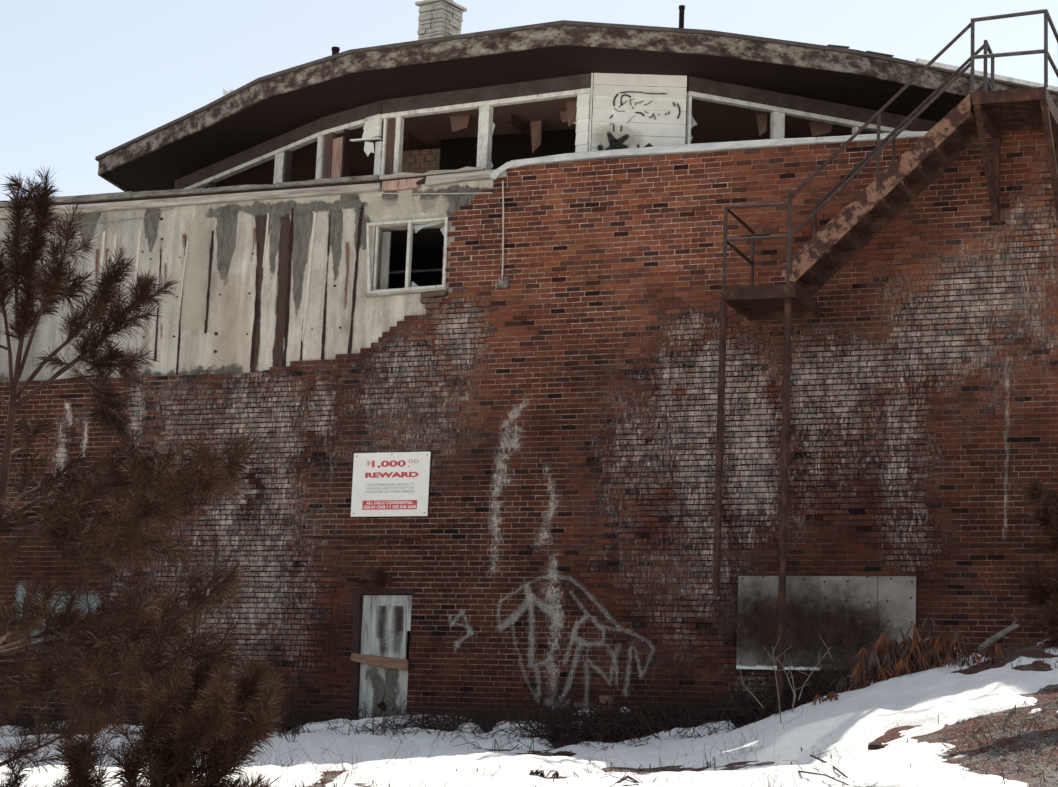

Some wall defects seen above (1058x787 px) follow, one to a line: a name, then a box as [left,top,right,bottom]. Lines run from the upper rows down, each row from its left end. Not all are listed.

efflorescence [360,300,486,414]
efflorescence [790,207,1054,474]
efflorescence [50,404,71,493]
water stain [128,194,370,664]
efflorescence [492,405,524,532]
efflorescence [617,339,779,597]
efflorescence [880,400,916,500]